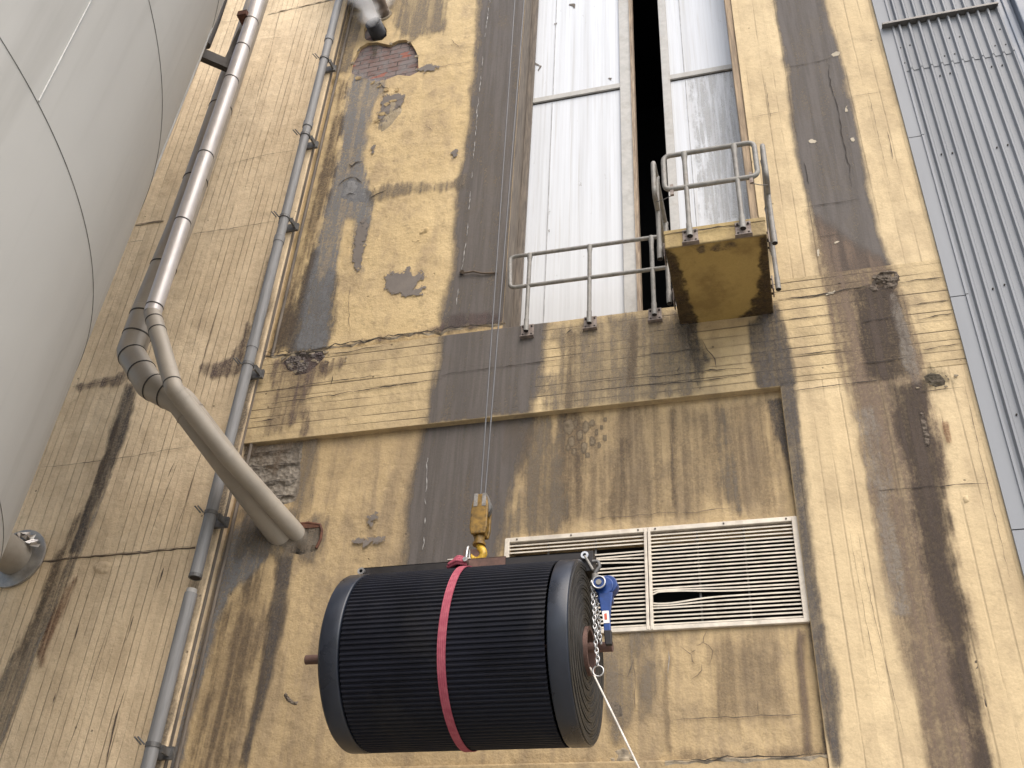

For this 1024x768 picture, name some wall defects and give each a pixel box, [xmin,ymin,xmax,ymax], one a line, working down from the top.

flaking render [351,30,440,126]
crack [754,57,893,208]
peeling [383,266,426,299]
damp [275,0,568,565]
spalling [869,270,900,292]
spalling [281,350,347,375]
damp [775,0,991,768]
spalling [916,373,958,389]
crack [42,445,201,588]
spalling [244,442,303,504]